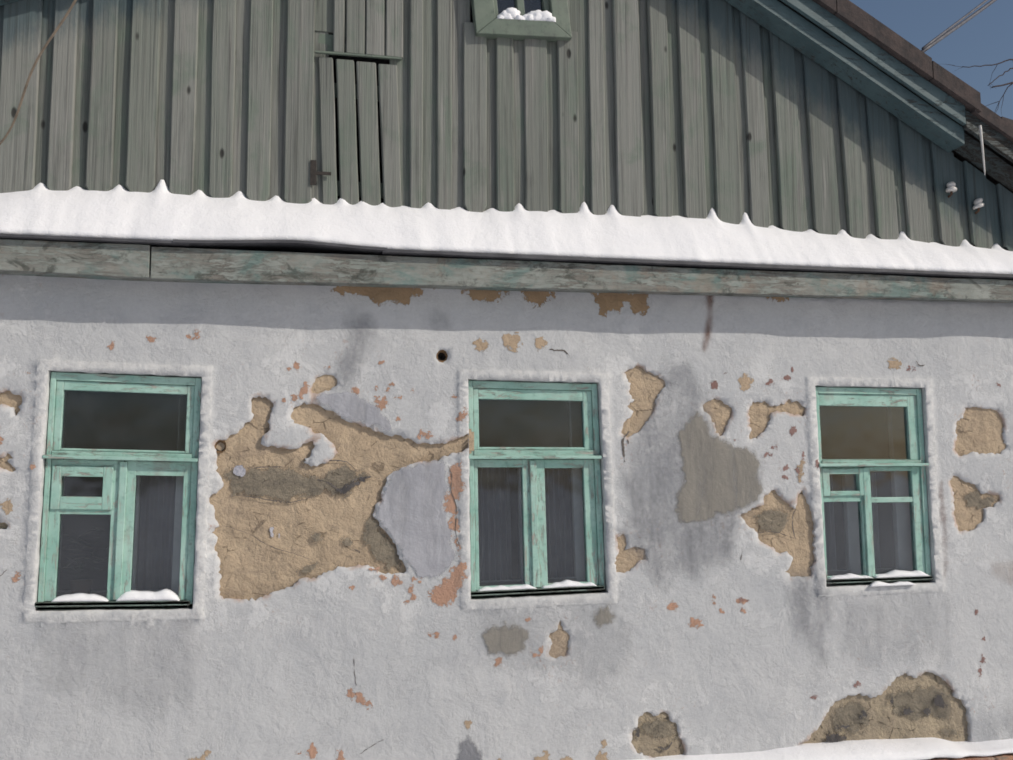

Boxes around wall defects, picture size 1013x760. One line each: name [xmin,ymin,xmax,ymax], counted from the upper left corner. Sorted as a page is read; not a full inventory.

peeling [0,391,22,415]
peeling [621,366,665,437]
peeling [0,436,16,472]
peeling [955,407,1006,456]
spalling [0,498,13,529]
peeling [209,366,474,608]
peeling [740,451,820,577]
peeling [950,476,999,531]
spalling [631,712,684,757]
spalling [802,672,968,744]